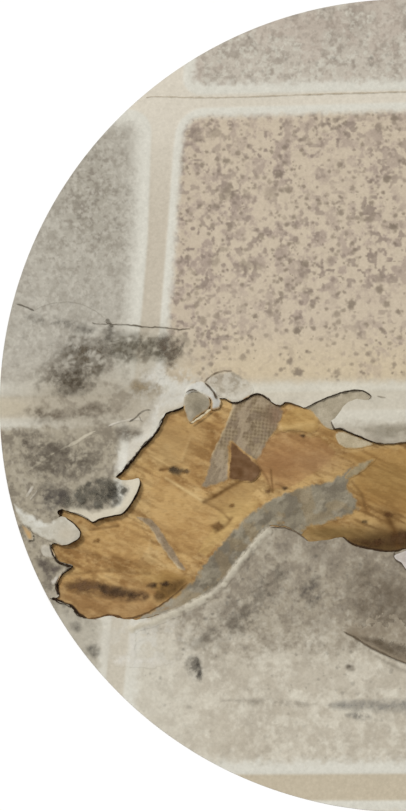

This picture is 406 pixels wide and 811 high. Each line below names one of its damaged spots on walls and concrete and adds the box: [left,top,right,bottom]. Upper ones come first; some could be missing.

damp [63,345,104,392]
peeling [280,407,319,433]
peeling [335,431,373,449]
damp [42,443,87,474]
peeling [13,359,254,559]
damp [44,490,67,504]
peeling [393,551,406,570]